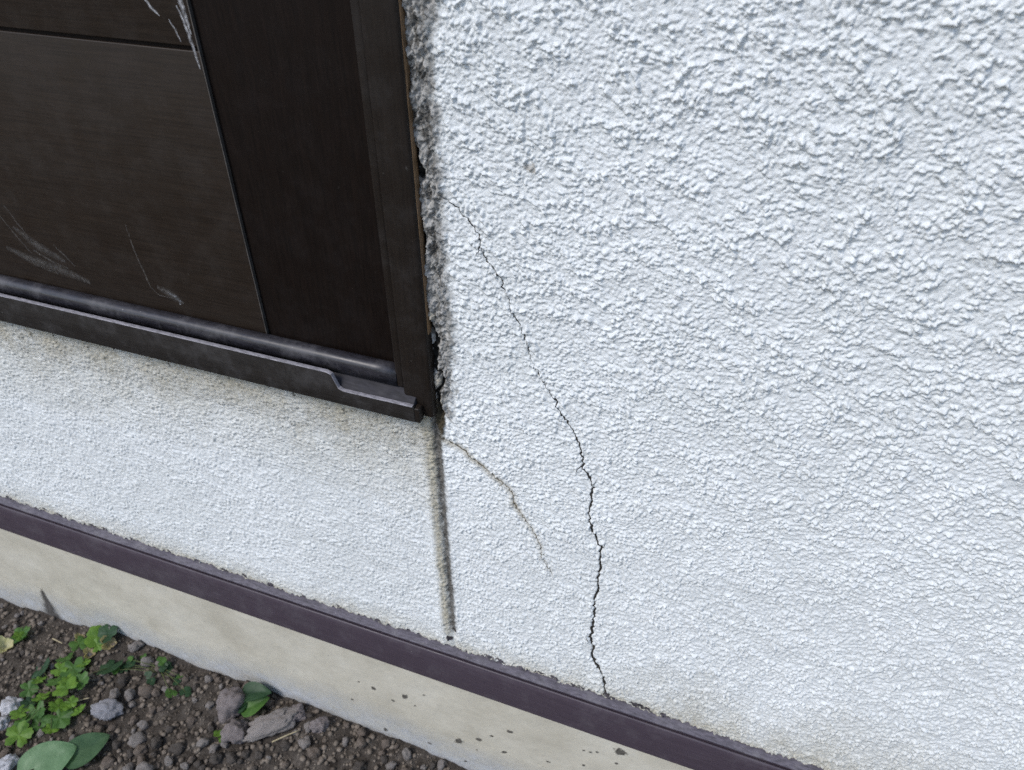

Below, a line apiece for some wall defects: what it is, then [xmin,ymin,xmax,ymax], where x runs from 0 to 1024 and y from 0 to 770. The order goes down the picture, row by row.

leakage [407,3,428,91]
leakage [413,99,433,200]
leakage [425,222,441,296]
leakage [0,321,389,430]
leakage [411,303,449,630]
crack [425,175,607,692]